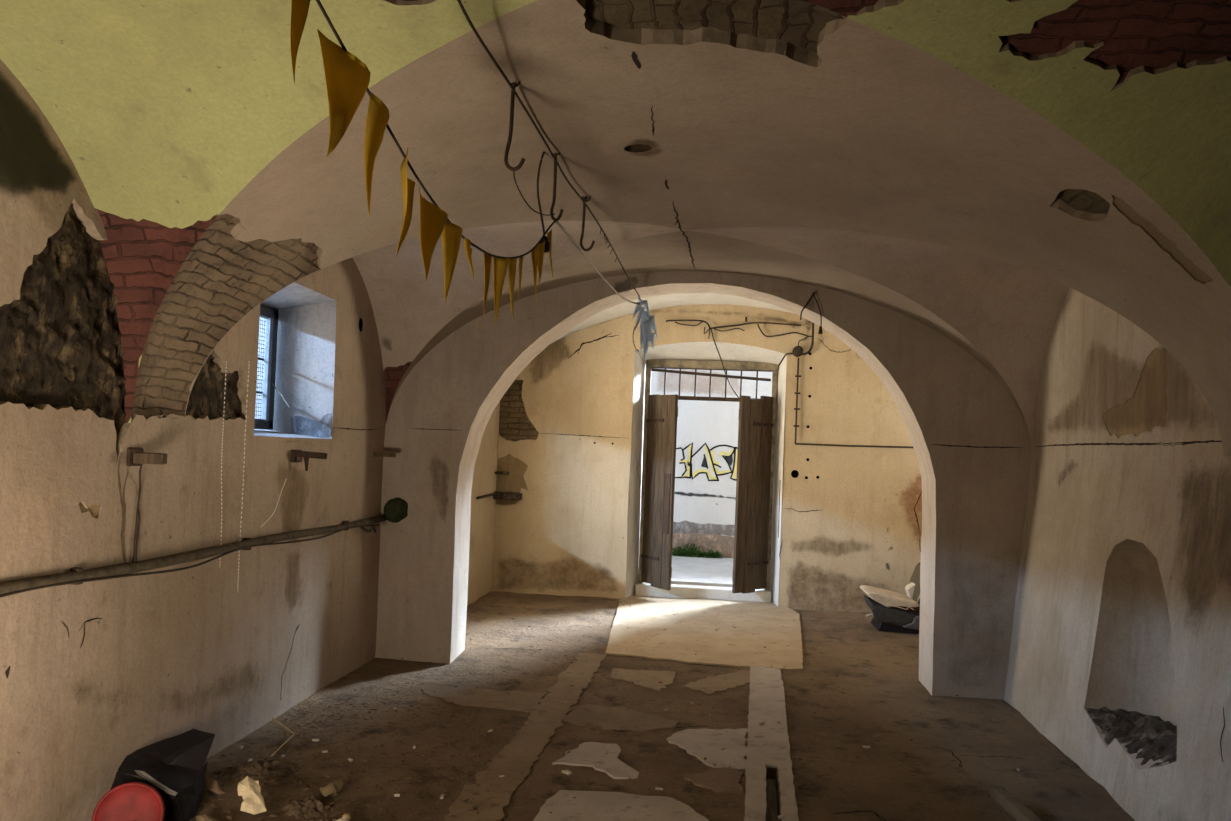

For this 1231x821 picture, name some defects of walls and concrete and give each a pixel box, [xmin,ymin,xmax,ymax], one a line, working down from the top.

flaking render [576,0,904,67]
flaking render [998,0,1231,92]
flaking render [0,199,323,462]
flaking render [290,413,331,437]
flaking render [495,380,539,505]
corrosion [908,479,922,510]